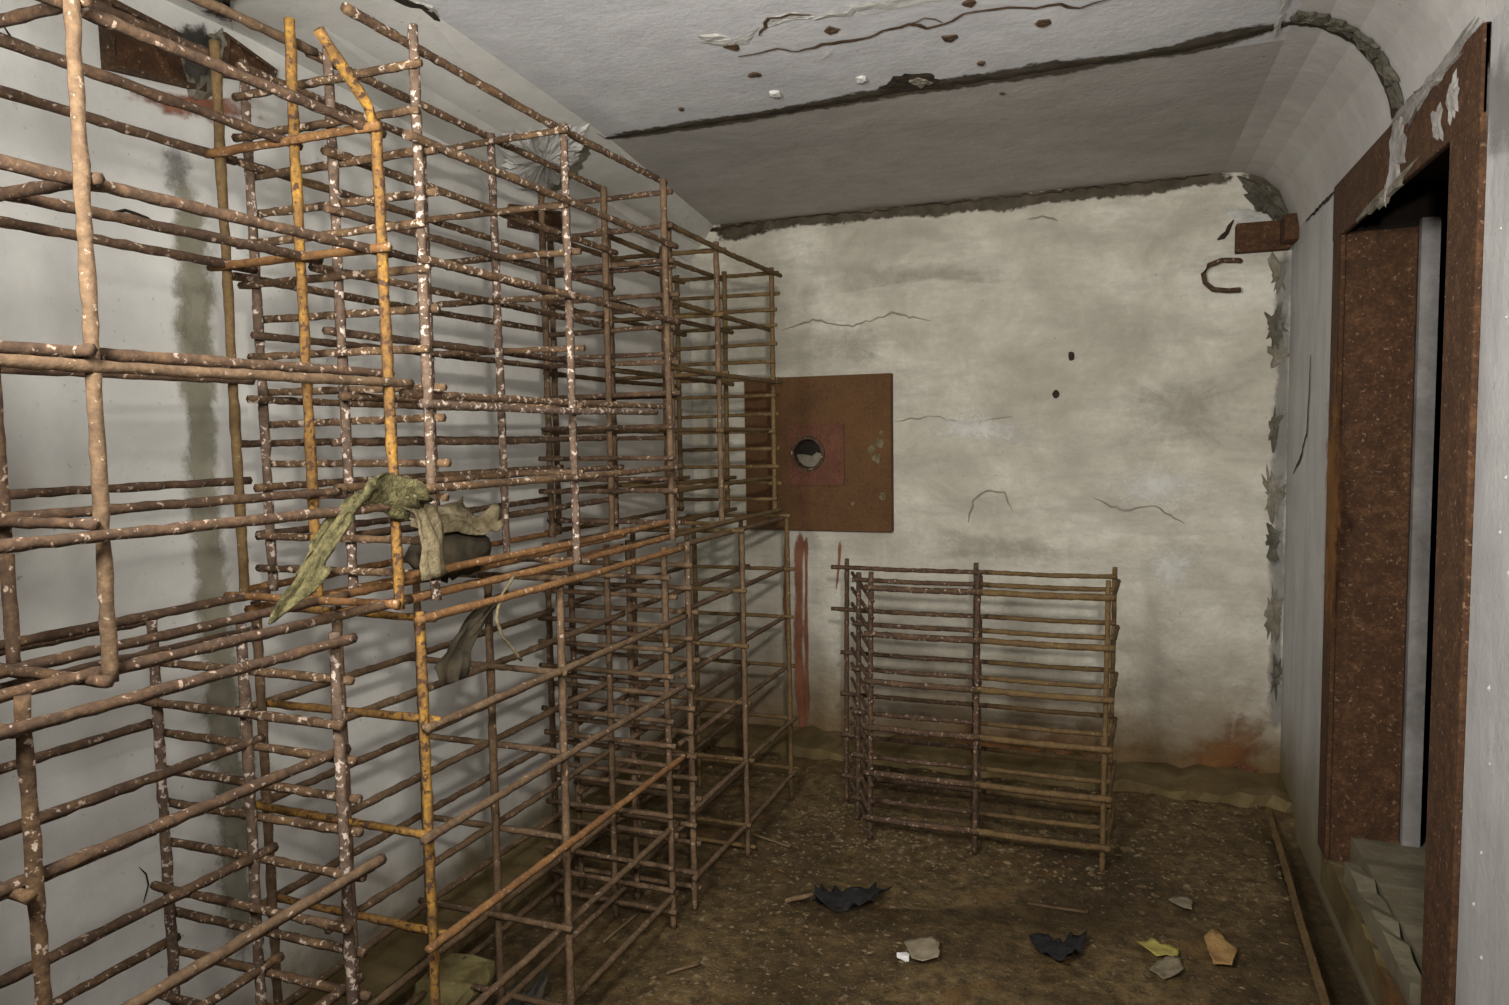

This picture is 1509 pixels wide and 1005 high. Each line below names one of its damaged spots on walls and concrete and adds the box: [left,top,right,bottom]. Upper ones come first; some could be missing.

water stain [175,0,232,49]
crack [394,0,440,22]
peeling [697,0,936,46]
crack [738,0,1105,57]
water stain [181,59,210,86]
spalling [879,73,957,93]
peeling [1288,10,1480,223]
spalling [1225,172,1289,224]
flaking render [1261,252,1292,725]
corrosion [1324,362,1342,636]
corrosion [783,534,810,728]